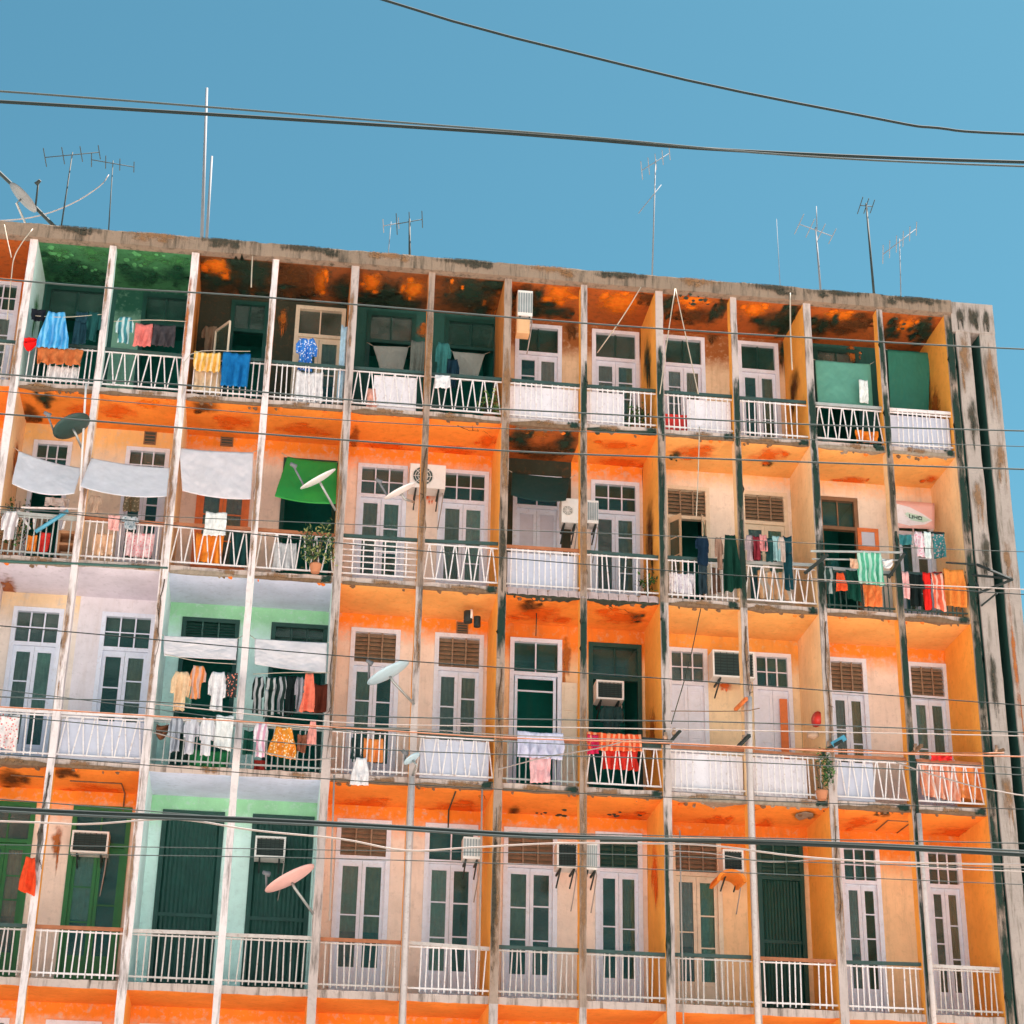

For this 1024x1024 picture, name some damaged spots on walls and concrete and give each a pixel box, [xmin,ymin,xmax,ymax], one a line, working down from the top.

water stain [637,293,727,343]
water stain [24,392,54,422]
water stain [501,350,588,504]
water stain [522,600,542,610]
water stain [748,283,834,776]
water stain [811,295,1014,1024]